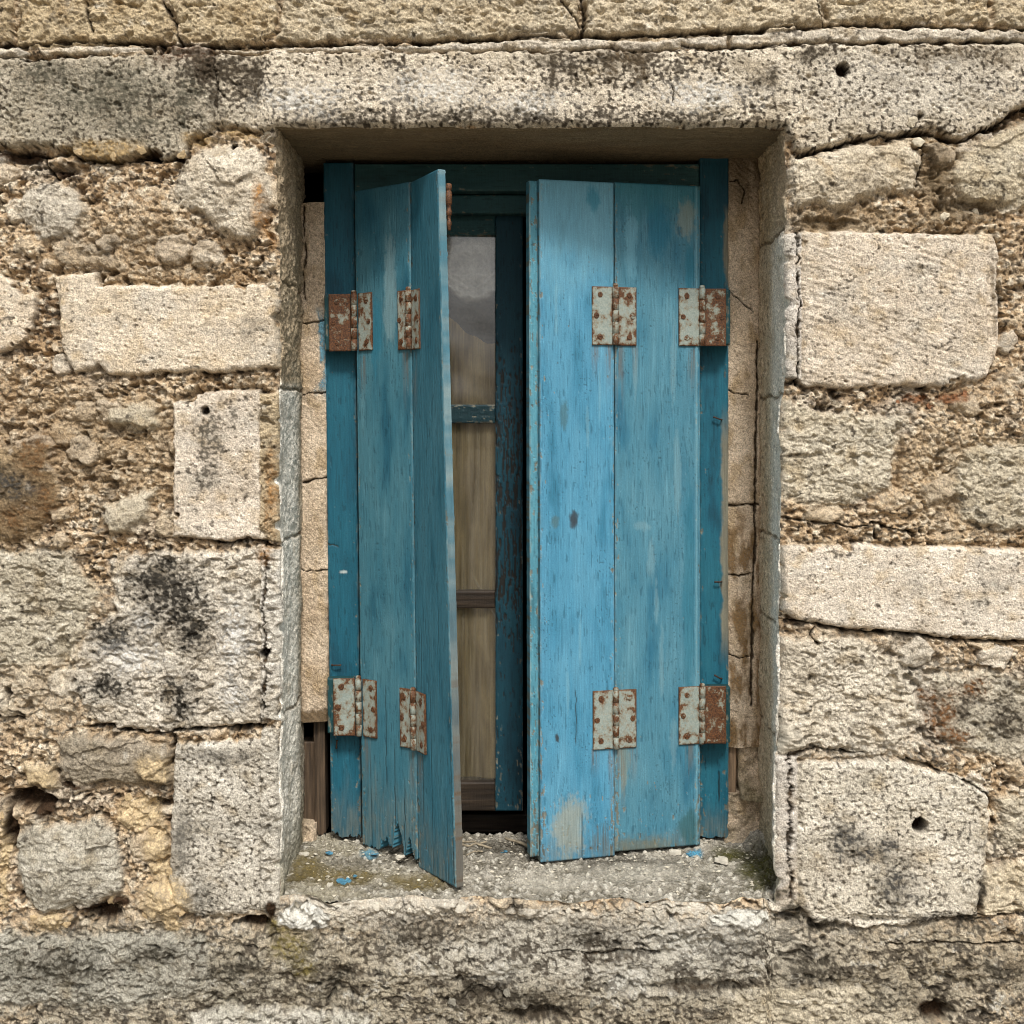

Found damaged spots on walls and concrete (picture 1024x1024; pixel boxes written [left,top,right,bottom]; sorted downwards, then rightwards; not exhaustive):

water stain [77,554,252,711]
water stain [160,674,199,729]
crack [94,536,280,760]
crack [728,341,759,706]